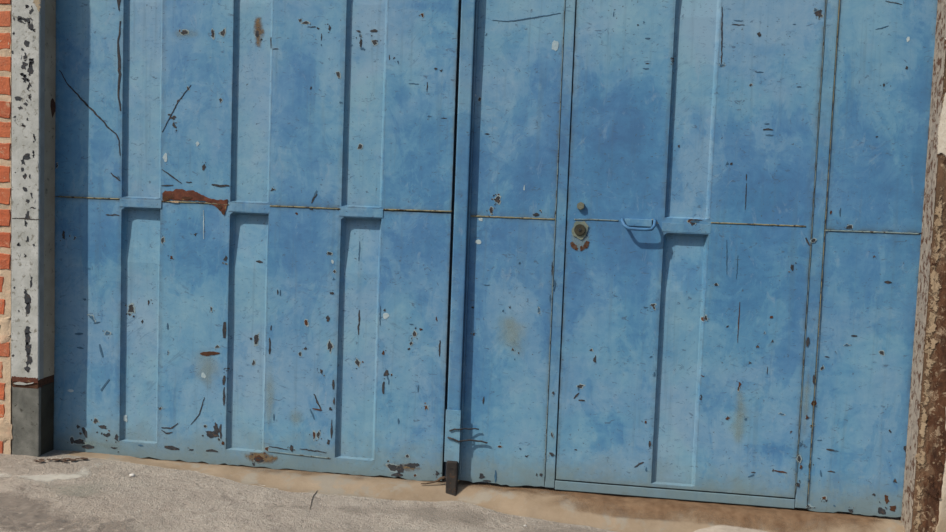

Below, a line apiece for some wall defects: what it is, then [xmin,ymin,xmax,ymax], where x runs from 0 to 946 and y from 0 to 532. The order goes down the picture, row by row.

peeling [937,93,946,156]
rust [162,189,228,215]
rust [12,375,54,389]
rust [246,452,277,462]